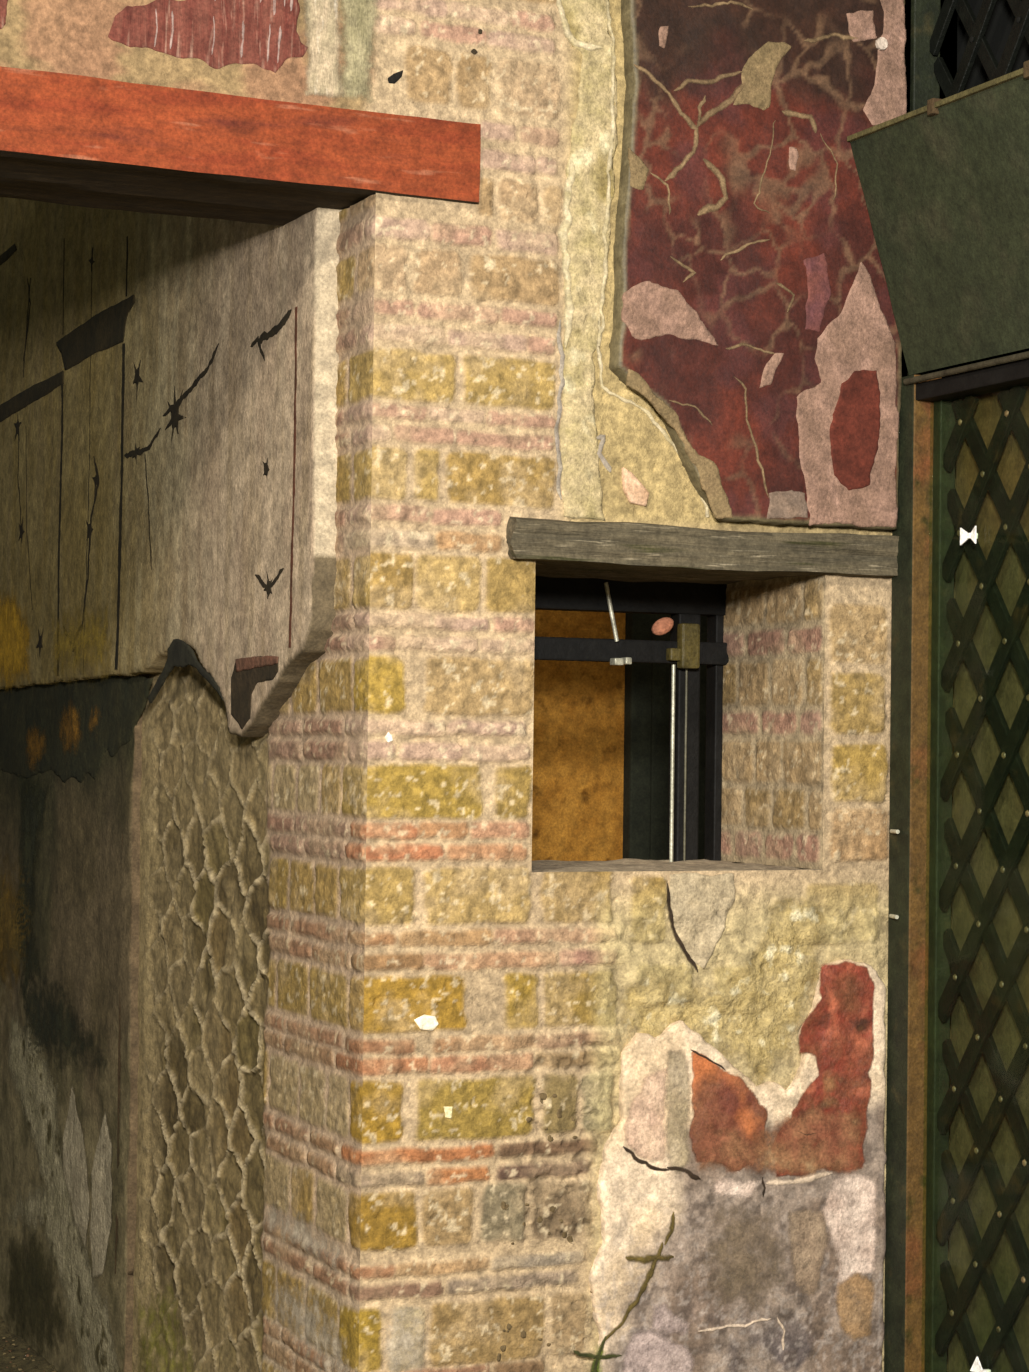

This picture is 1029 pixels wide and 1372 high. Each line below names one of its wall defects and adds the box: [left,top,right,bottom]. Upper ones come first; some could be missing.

crack [688,0,752,9]
crack [634,64,838,282]
peeling [609,0,907,530]
crack [63,309,292,652]
crack [726,343,775,498]
spalling [148,639,279,729]
crack [667,883,698,972]
crack [623,1146,701,1180]
crack [692,1050,725,1070]
peeling [588,900,887,1372]
crack [573,1212,675,1372]
water stain [711,1210,782,1306]